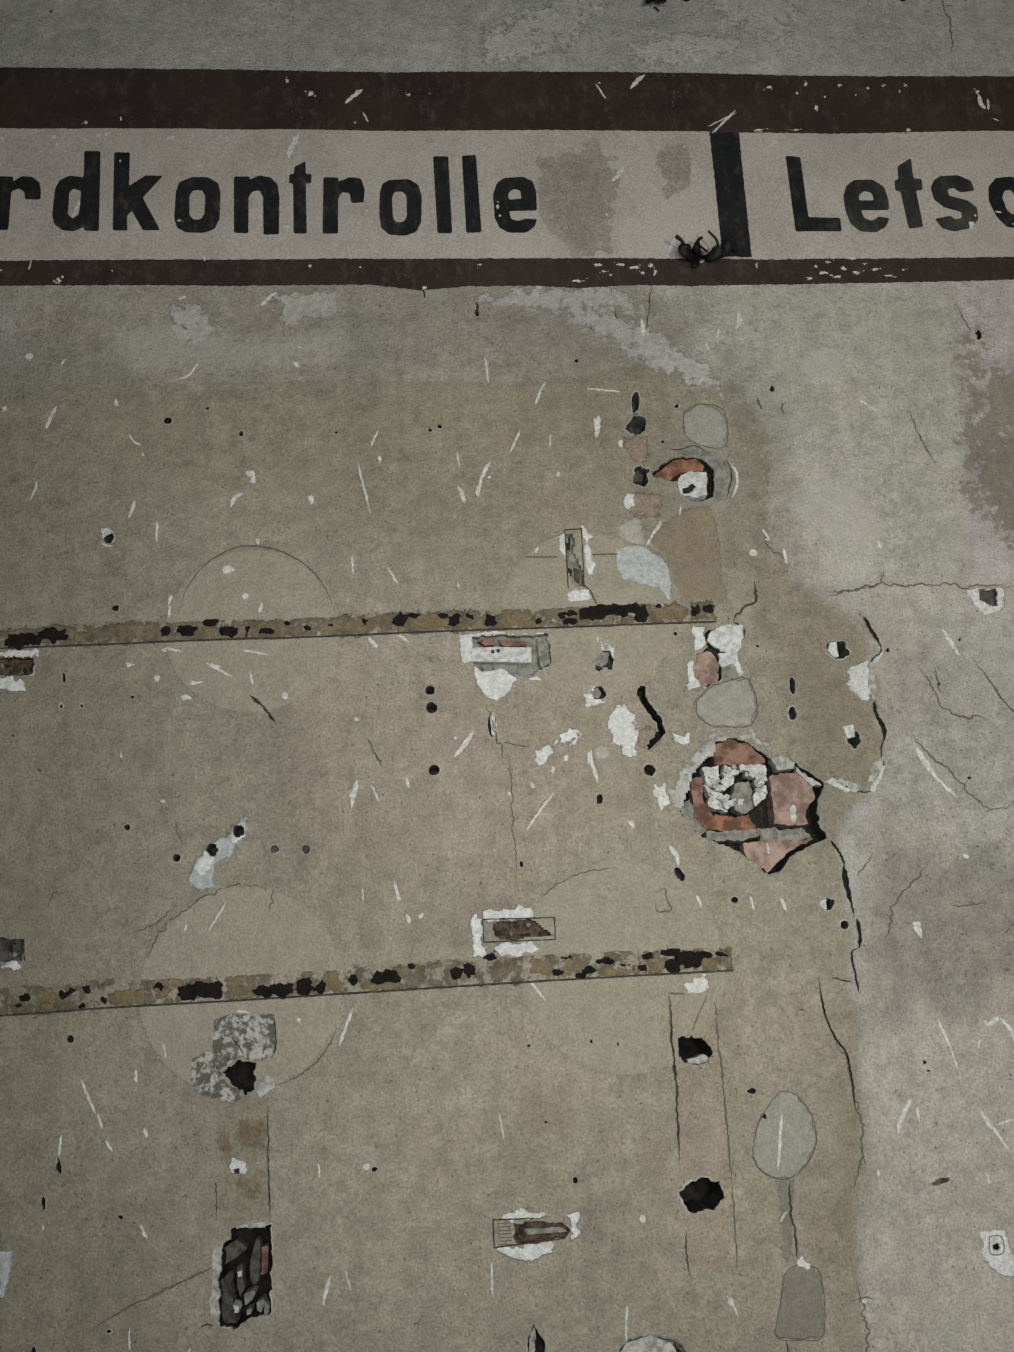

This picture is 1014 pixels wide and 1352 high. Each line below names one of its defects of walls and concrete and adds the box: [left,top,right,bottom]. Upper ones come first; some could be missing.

spalling [618,433,739,503]
water stain [942,310,1014,571]
rust [0,597,720,653]
crack [826,572,1014,598]
spalling [456,631,552,736]
flaking render [578,686,644,761]
crack [919,655,1014,720]
crack [914,736,1014,812]
spalling [650,611,890,1110]
rust [0,941,739,1021]
spalling [190,1013,277,1103]
crack [668,992,826,1352]